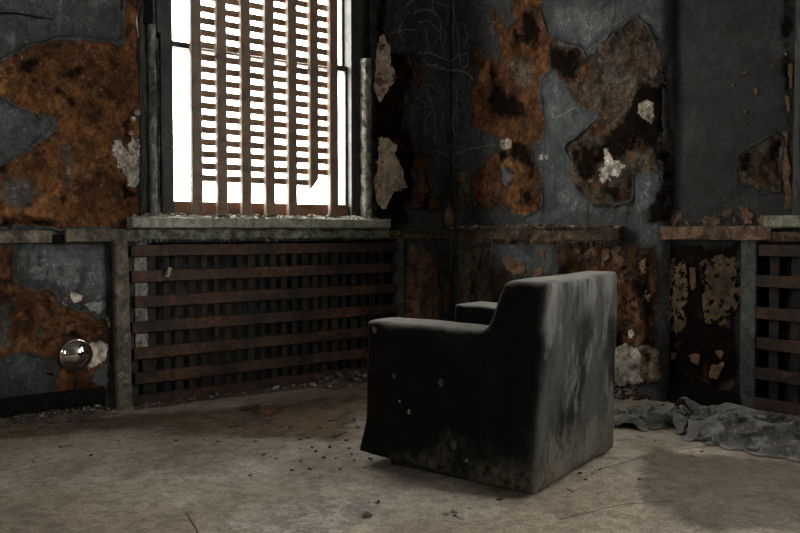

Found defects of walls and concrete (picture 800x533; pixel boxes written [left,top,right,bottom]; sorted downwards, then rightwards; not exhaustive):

flaking render [0,0,148,232]
flaking render [373,34,396,102]
crack [391,0,493,205]
flaking render [468,0,670,218]
flaking render [373,137,408,209]
flaking render [735,130,792,210]
flaking render [0,243,113,392]
peeling [575,245,627,305]
peeling [669,254,741,334]
peeling [709,350,724,380]